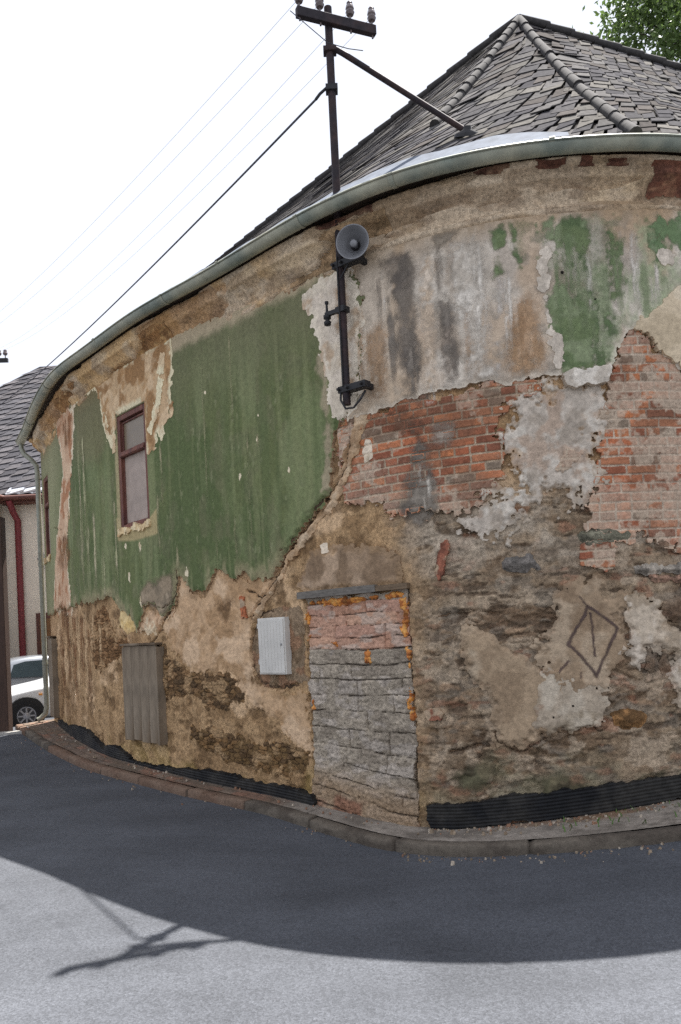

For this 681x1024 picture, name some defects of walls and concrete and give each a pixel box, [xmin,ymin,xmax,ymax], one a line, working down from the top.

flaking render [473,163,510,175]
flaking render [536,155,629,169]
flaking render [646,160,681,200]
damp [630,236,659,300]
damp [377,232,512,400]
flaking render [290,204,542,521]
flaking render [535,211,681,572]
flaking render [54,320,174,618]
spalling [90,605,129,674]
spalling [162,649,245,711]
spalling [250,605,312,688]
spalling [189,724,311,782]